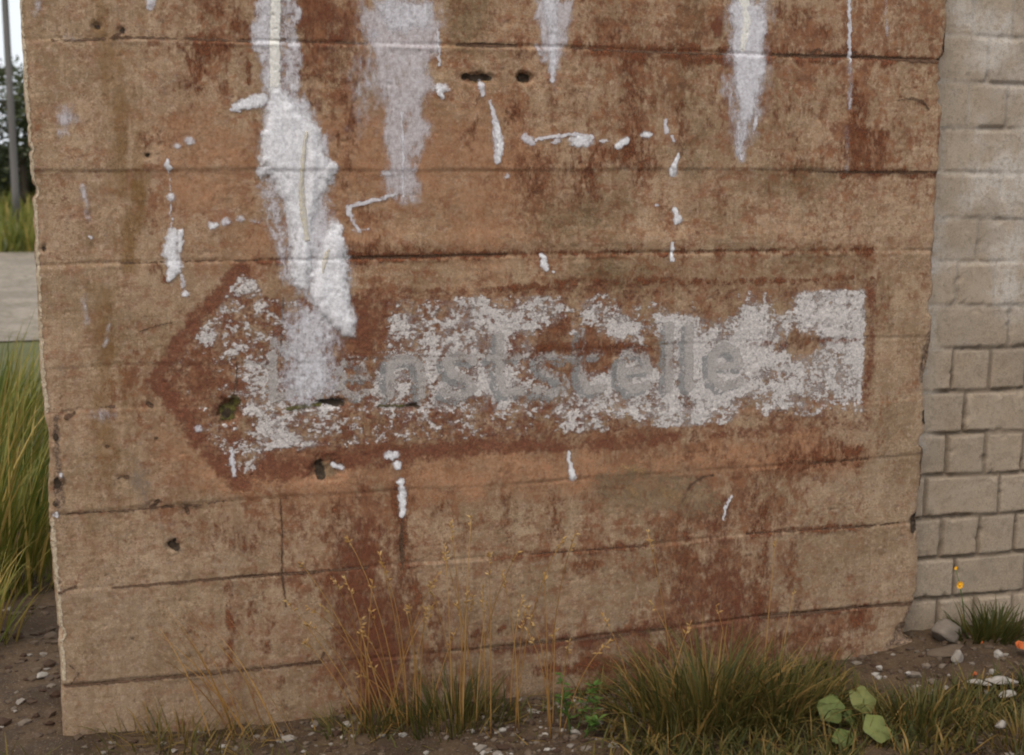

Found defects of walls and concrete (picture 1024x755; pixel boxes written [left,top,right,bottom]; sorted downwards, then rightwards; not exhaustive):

spalling [461,73,492,83]
damp [711,0,767,160]
damp [521,119,680,176]
corrosion [834,80,936,179]
damp [229,0,448,405]
spalling [286,398,344,411]
crack [66,500,226,515]
spalling [314,459,343,480]
damp [384,451,407,518]
crack [112,498,369,607]
corrosion [200,430,869,714]
crack [532,545,646,554]